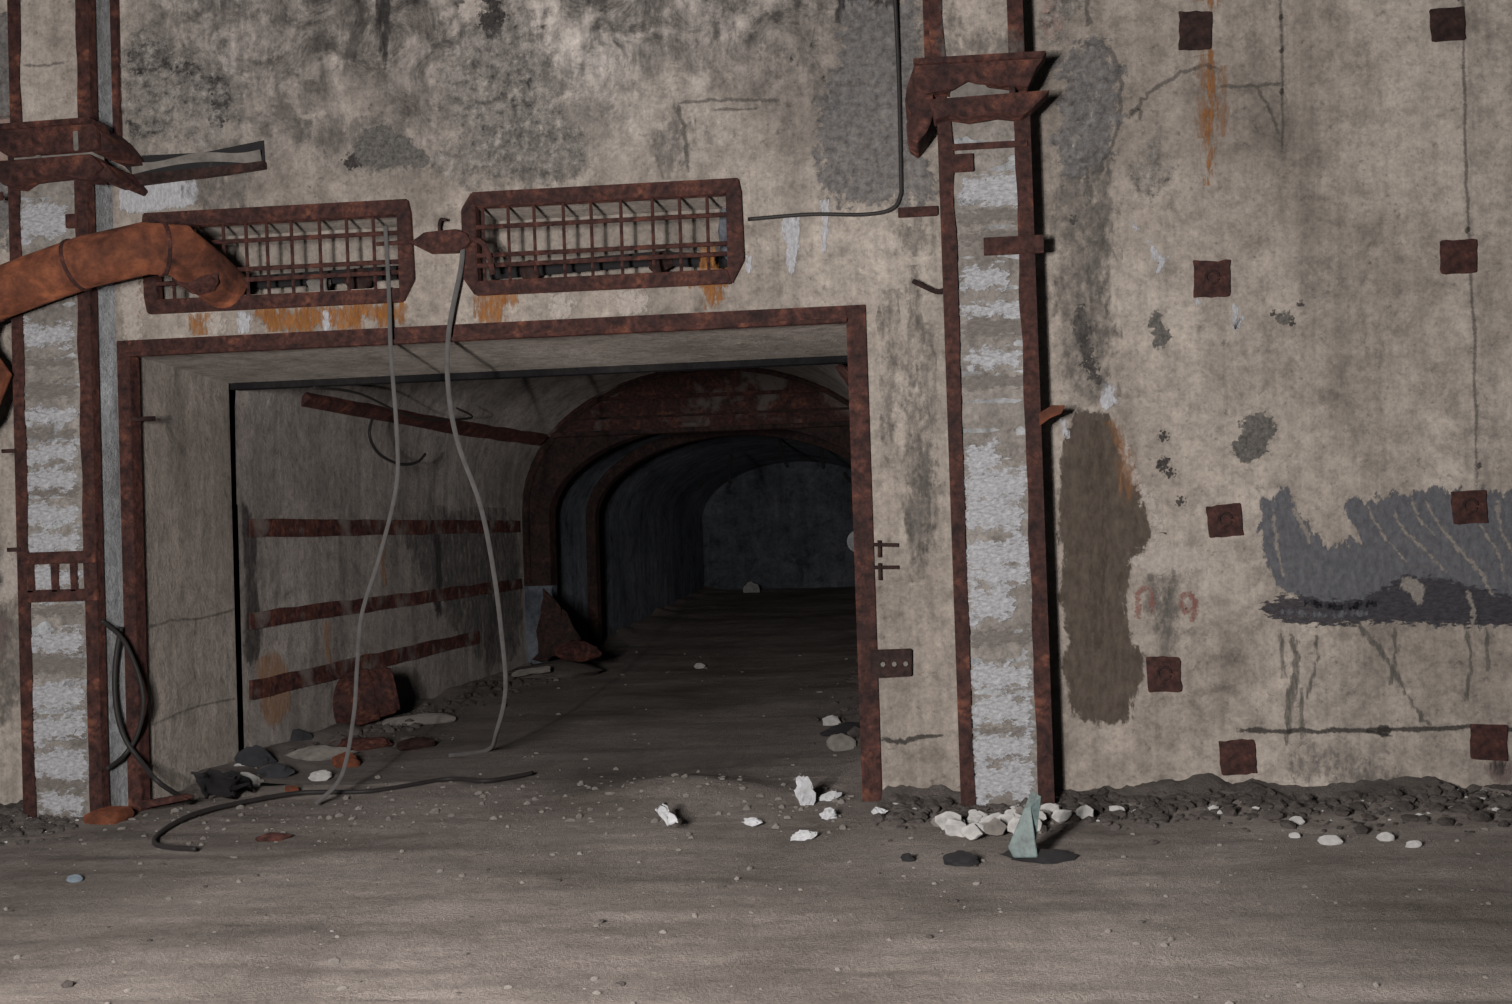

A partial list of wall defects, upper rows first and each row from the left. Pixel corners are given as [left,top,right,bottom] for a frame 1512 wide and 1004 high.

water stain [375,0,390,61]
corrosion [1200,48,1227,186]
corrosion [189,302,406,336]
corrosion [473,294,517,323]
corrosion [548,293,578,319]
corrosion [610,290,649,316]
water stain [1057,410,1176,725]